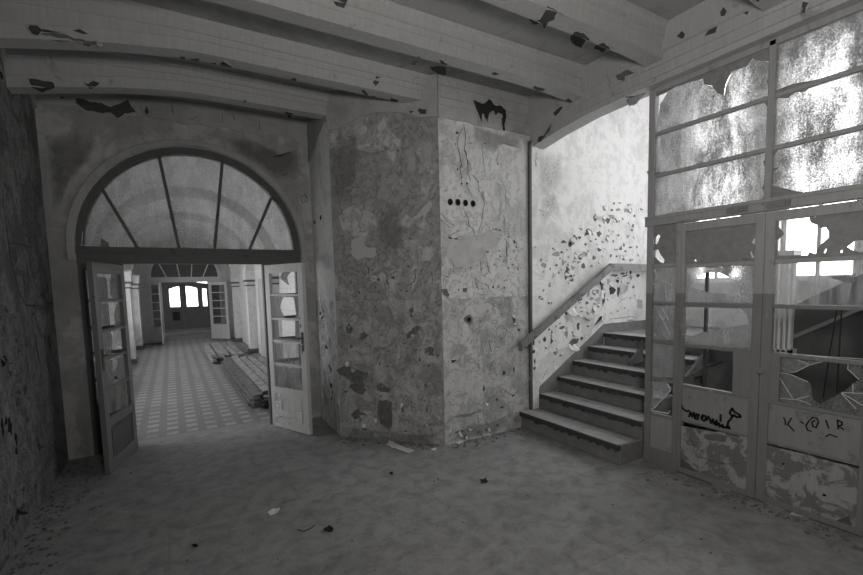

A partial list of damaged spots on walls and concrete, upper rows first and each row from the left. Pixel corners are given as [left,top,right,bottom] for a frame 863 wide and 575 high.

peeling [529,6,564,28]
peeling [27,25,103,47]
peeling [570,31,615,52]
peeling [28,78,149,119]
peeling [473,99,506,131]
spalling [448,198,476,207]
crack [443,123,517,423]
peeling [372,307,439,367]
peeling [329,361,437,453]